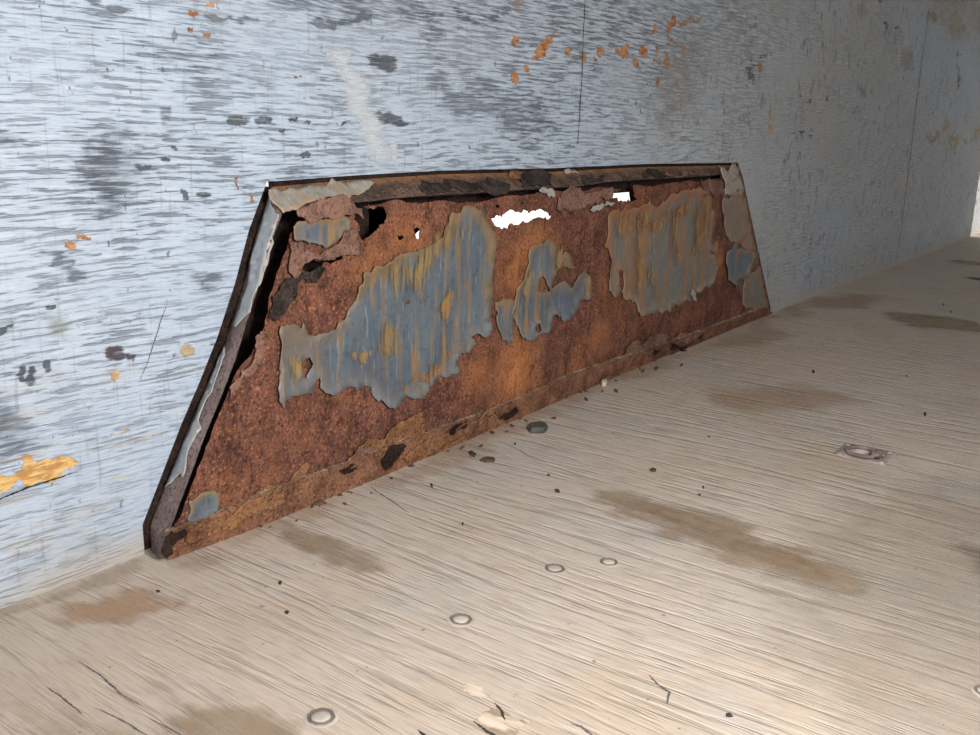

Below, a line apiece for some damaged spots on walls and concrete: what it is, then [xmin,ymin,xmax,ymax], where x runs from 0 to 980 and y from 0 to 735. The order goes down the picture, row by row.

peeling [511,29,558,85]
peeling [565,16,701,70]
leakage [887,313,980,332]
peeling [0,454,78,493]
leakage [598,491,863,592]